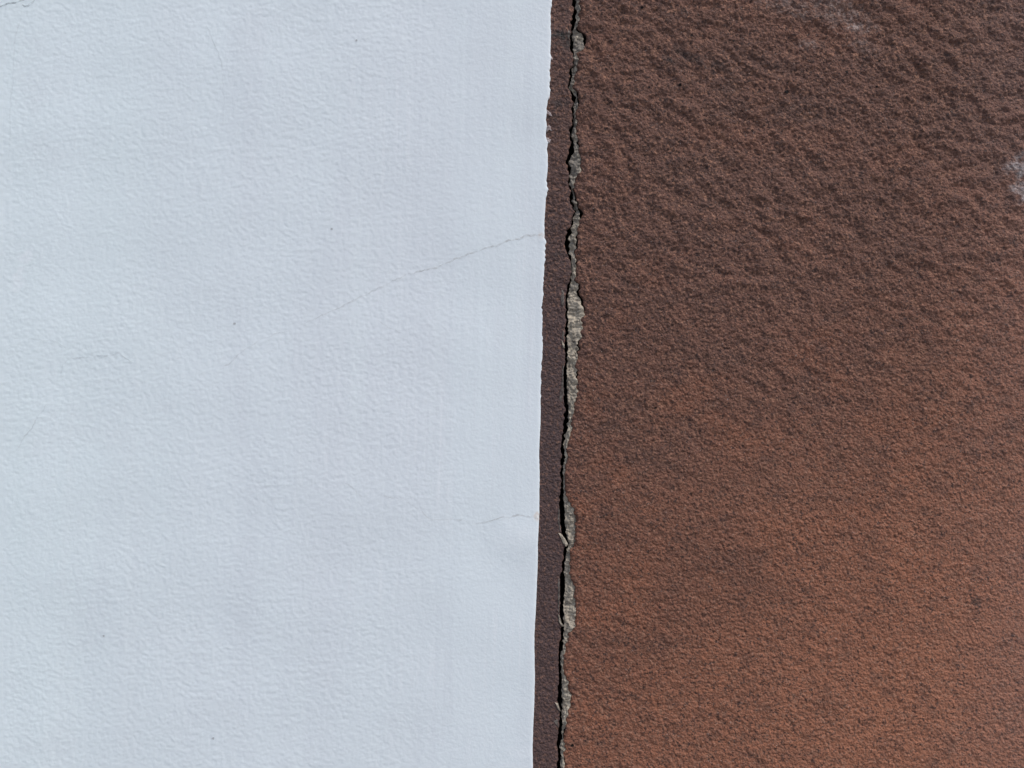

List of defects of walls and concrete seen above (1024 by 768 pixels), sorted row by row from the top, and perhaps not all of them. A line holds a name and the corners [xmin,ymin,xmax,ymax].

crack [554,0,587,768]